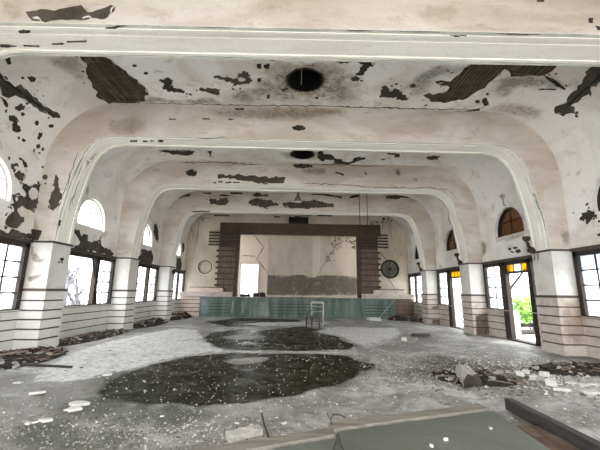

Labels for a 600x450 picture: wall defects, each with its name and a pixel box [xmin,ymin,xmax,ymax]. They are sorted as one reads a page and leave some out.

flaking render [26,5,116,23]
flaking render [0,73,60,142]
flaking render [75,56,149,104]
peeling [159,71,262,97]
leakage [235,64,349,101]
peeling [379,83,416,101]
flaking render [423,64,600,118]
peeling [0,156,62,239]
flaking render [213,174,286,185]
peeling [573,202,600,236]
peeling [75,229,114,256]
leakage [33,318,400,423]